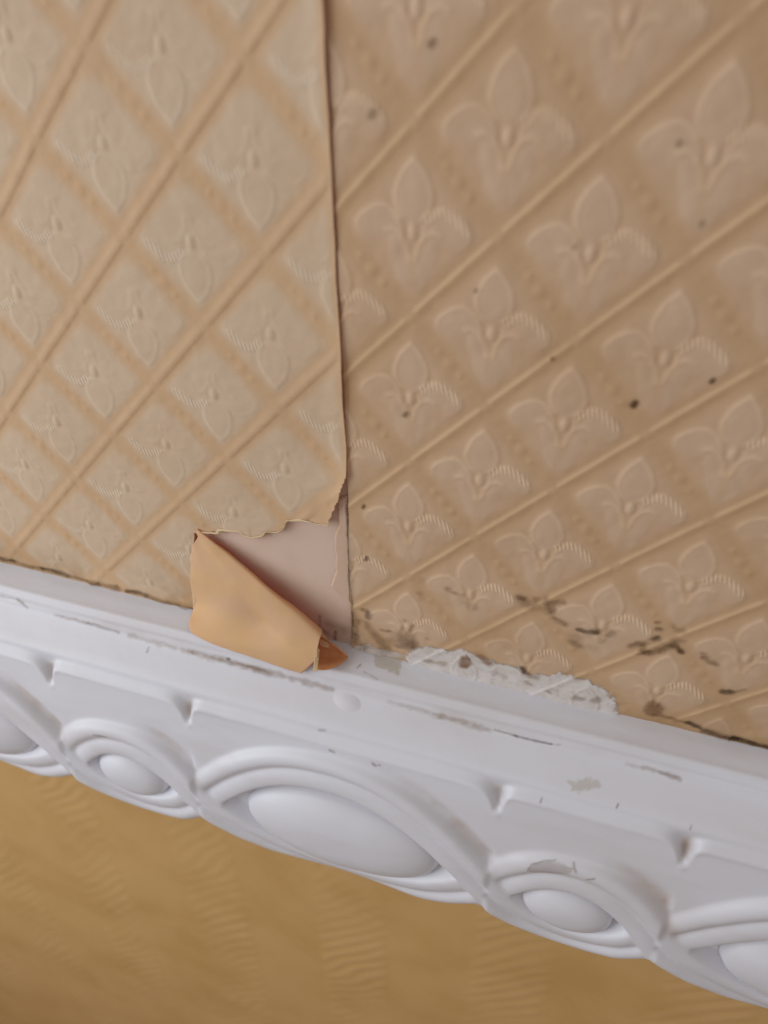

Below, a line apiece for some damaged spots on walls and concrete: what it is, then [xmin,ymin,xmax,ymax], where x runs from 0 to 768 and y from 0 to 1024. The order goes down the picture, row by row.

water stain [460,656,490,668]
water stain [644,702,662,716]